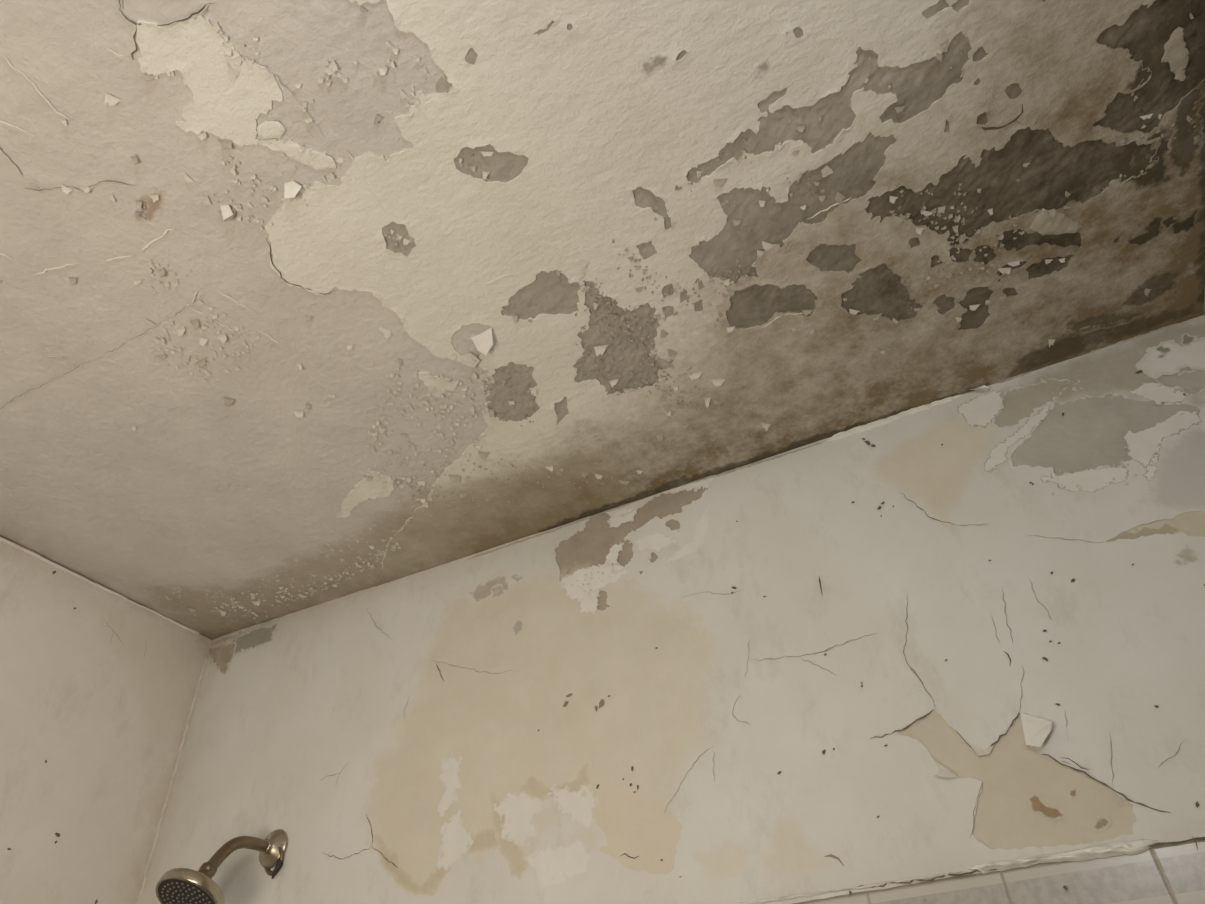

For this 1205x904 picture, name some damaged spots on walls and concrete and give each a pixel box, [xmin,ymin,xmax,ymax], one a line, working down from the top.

peeling [501,0,1205,429]
peeling [0,0,643,676]
leakage [78,0,1205,747]
peeling [467,370,1205,615]
leakage [359,559,845,904]
crack [732,633,877,724]
crack [869,595,935,739]
crack [955,581,1052,748]
peeling [897,710,1159,874]
crack [1041,717,1171,813]
crack [1148,836,1205,849]